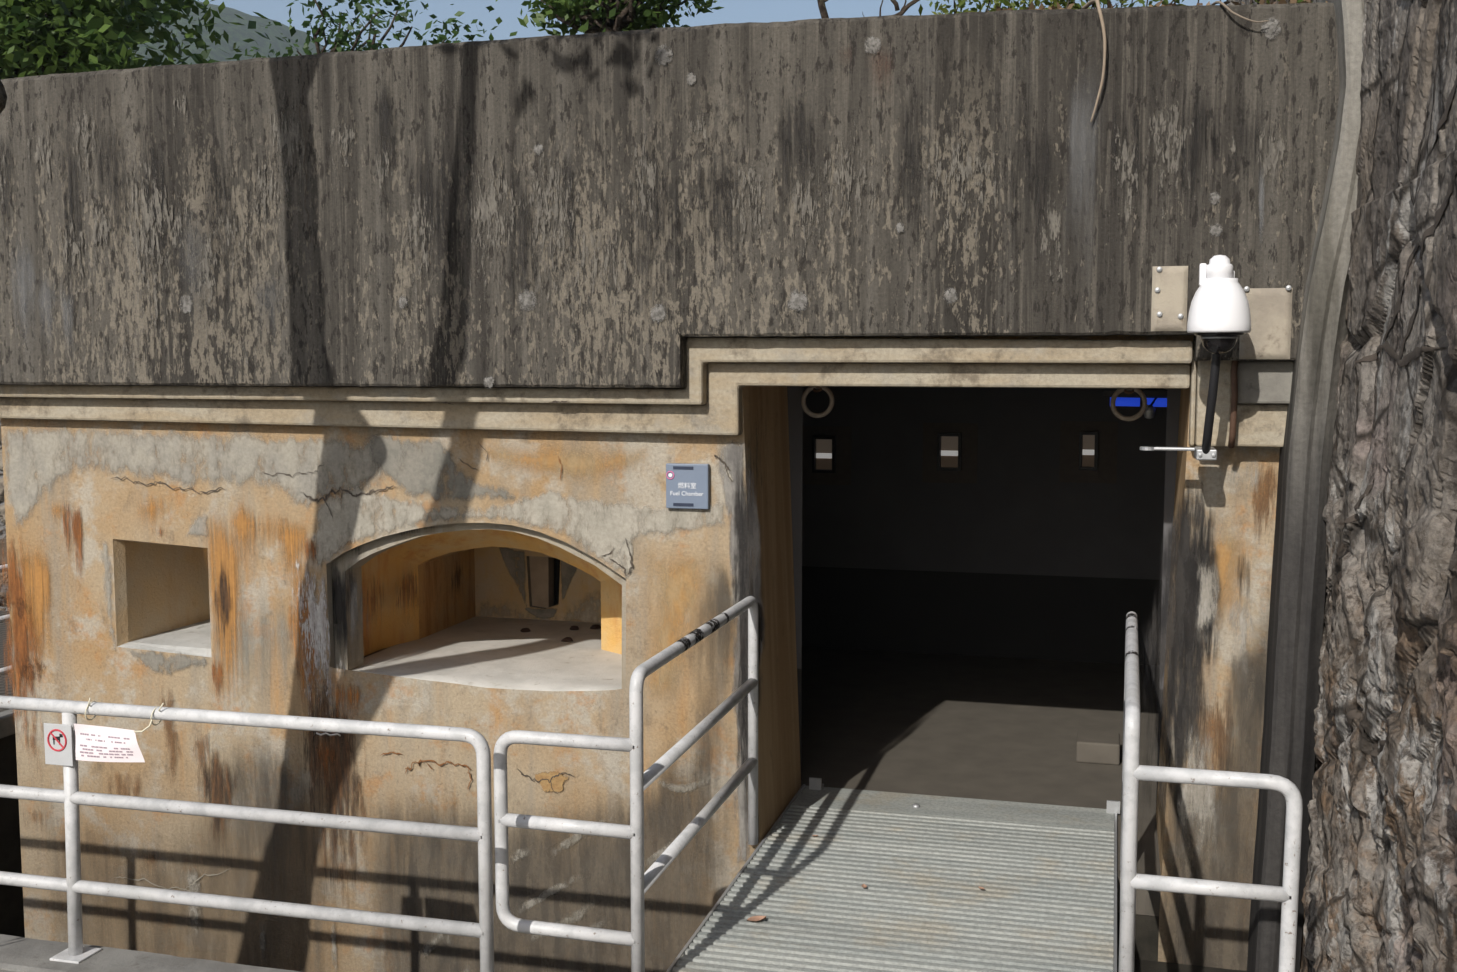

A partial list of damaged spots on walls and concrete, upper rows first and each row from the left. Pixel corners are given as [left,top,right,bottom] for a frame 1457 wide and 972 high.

water stain [631,151,677,290]
water stain [1072,104,1141,181]
water stain [1181,106,1212,198]
corrosion [52,502,82,568]
crack [111,476,225,494]
crack [260,465,395,521]
corrosion [0,542,49,747]
corrosion [209,508,365,876]
peeling [4,428,748,861]
crack [380,752,472,789]
water stain [703,434,765,789]
water stain [1139,488,1268,971]